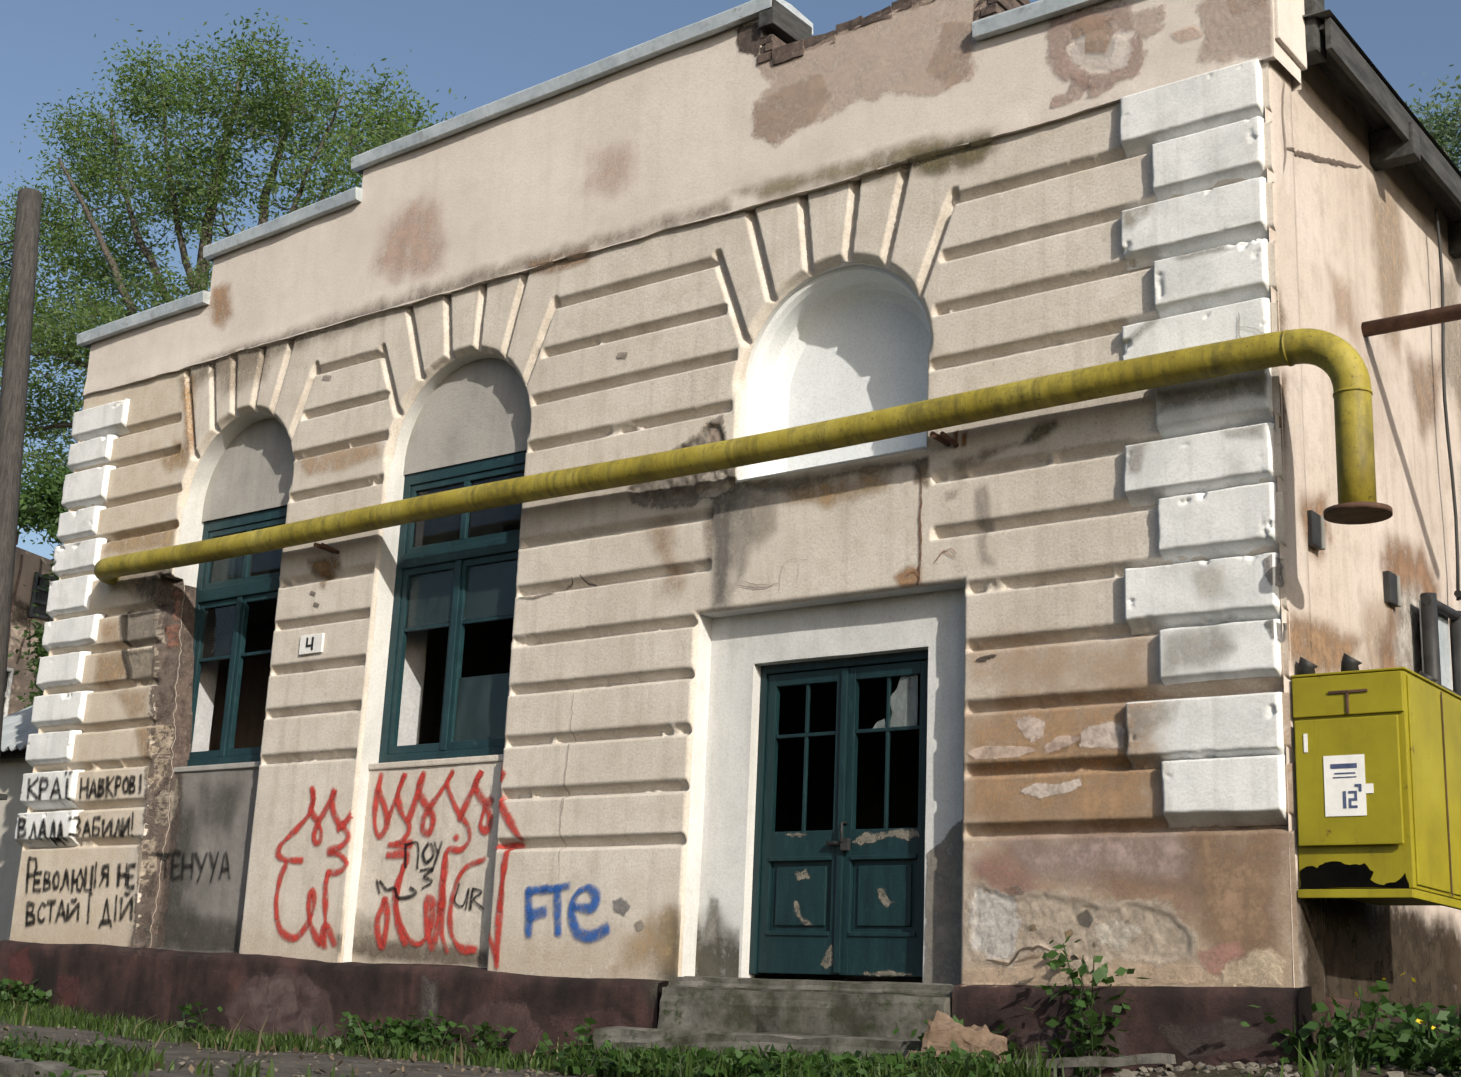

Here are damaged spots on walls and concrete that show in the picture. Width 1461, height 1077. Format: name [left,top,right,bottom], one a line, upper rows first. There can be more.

peeling [736,0,988,144]
damp [760,136,991,196]
crack [1282,78,1362,171]
damp [182,244,588,391]
damp [1374,193,1403,346]
damp [1412,281,1461,431]
flaking render [628,467,737,509]
damp [706,483,773,603]
crack [905,462,957,586]
flaking render [119,579,183,948]
peeling [967,716,1125,759]
flaking render [963,881,1285,987]